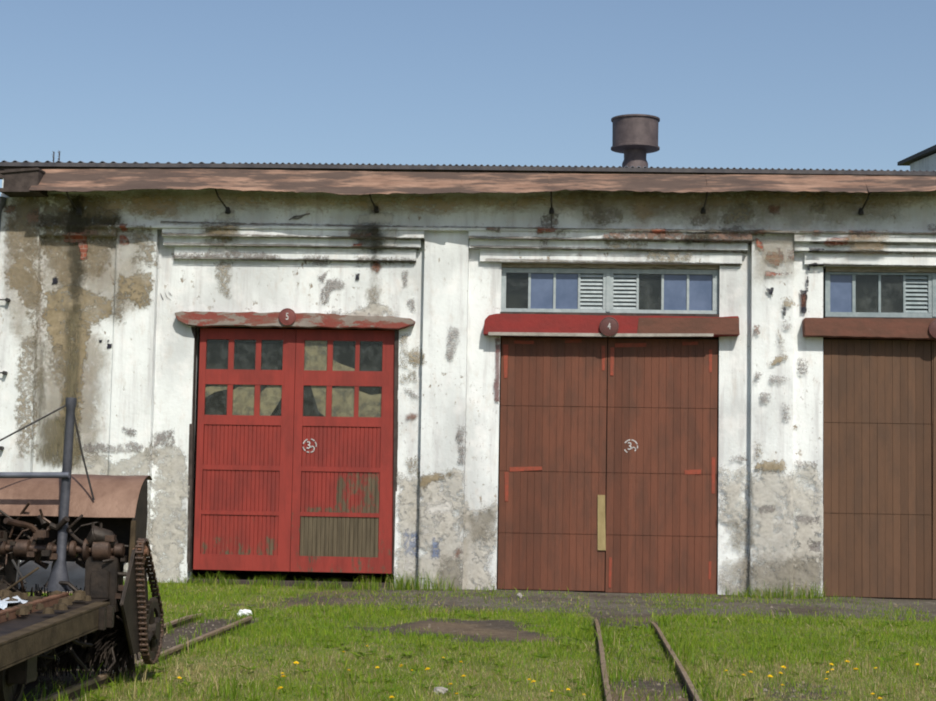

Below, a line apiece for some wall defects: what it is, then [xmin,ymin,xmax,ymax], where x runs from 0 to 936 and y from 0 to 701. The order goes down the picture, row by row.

peeling [4,191,158,333]
leakage [15,194,419,467]
peeling [400,335,425,398]
peeling [446,328,459,360]
flaking render [71,427,190,583]
flaking render [394,427,498,590]
flaking render [718,444,823,597]